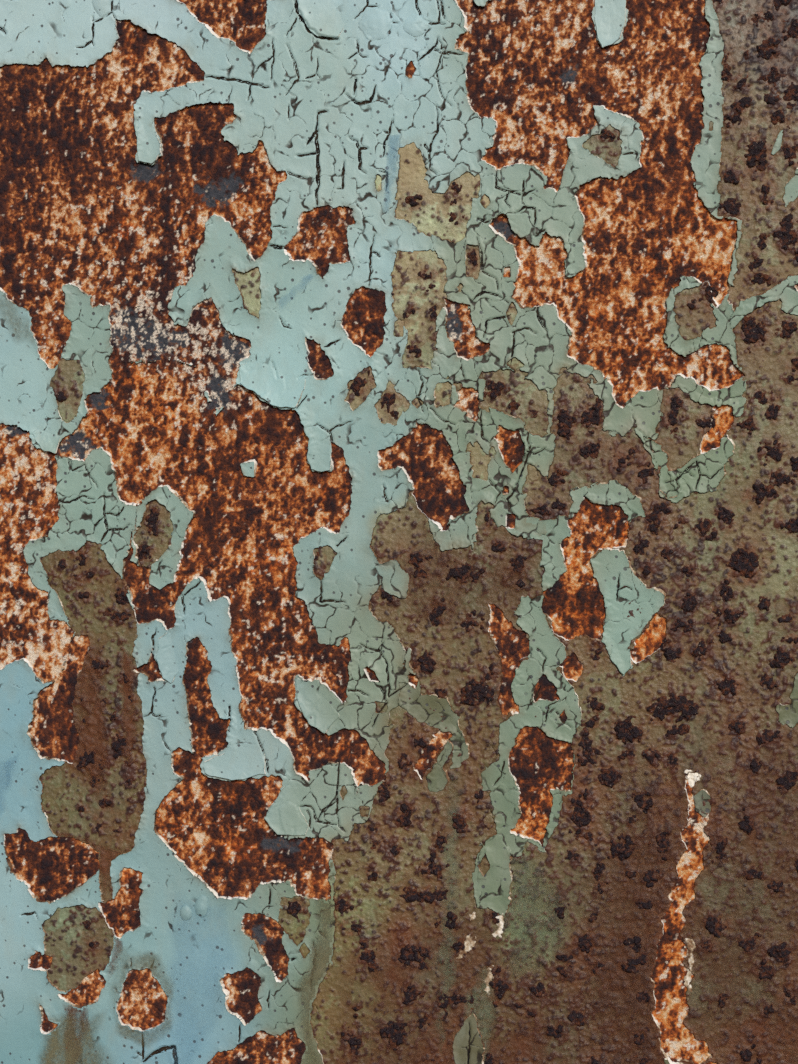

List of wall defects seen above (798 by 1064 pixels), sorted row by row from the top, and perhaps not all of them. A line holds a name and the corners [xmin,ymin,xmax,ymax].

crack [206,0,463,175]
crack [287,110,392,209]
crack [471,169,547,363]
rust [453,0,798,505]
peeling [50,358,85,423]
peeling [130,485,195,589]
rust [0,19,453,972]
peeling [240,459,257,477]
peeling [310,0,798,1064]
rust [506,468,764,722]
crack [300,761,345,832]
rust [508,692,728,1064]